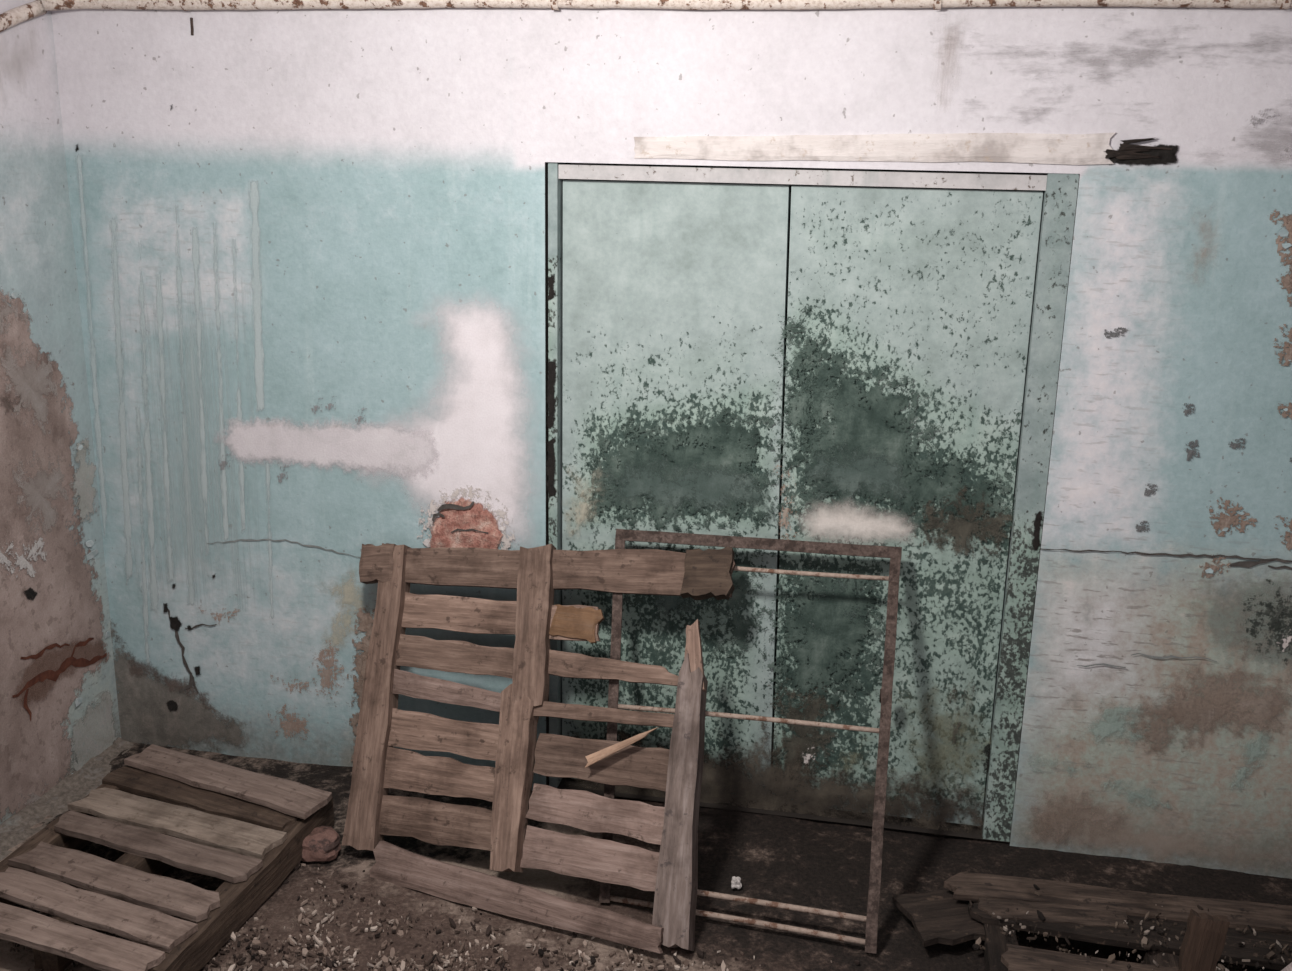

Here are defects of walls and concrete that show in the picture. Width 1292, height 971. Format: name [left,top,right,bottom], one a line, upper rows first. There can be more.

peeling [1267,209,1292,307]
peeling [1273,324,1292,366]
peeling [1278,403,1292,420]
leakage [110,181,264,752]
peeling [0,289,119,821]
spalling [416,485,515,550]
crack [1040,549,1292,570]
peeling [1199,554,1231,578]
peeling [1209,497,1258,537]
peeling [1274,516,1292,550]
crack [163,584,217,693]
leakage [1241,579,1292,664]